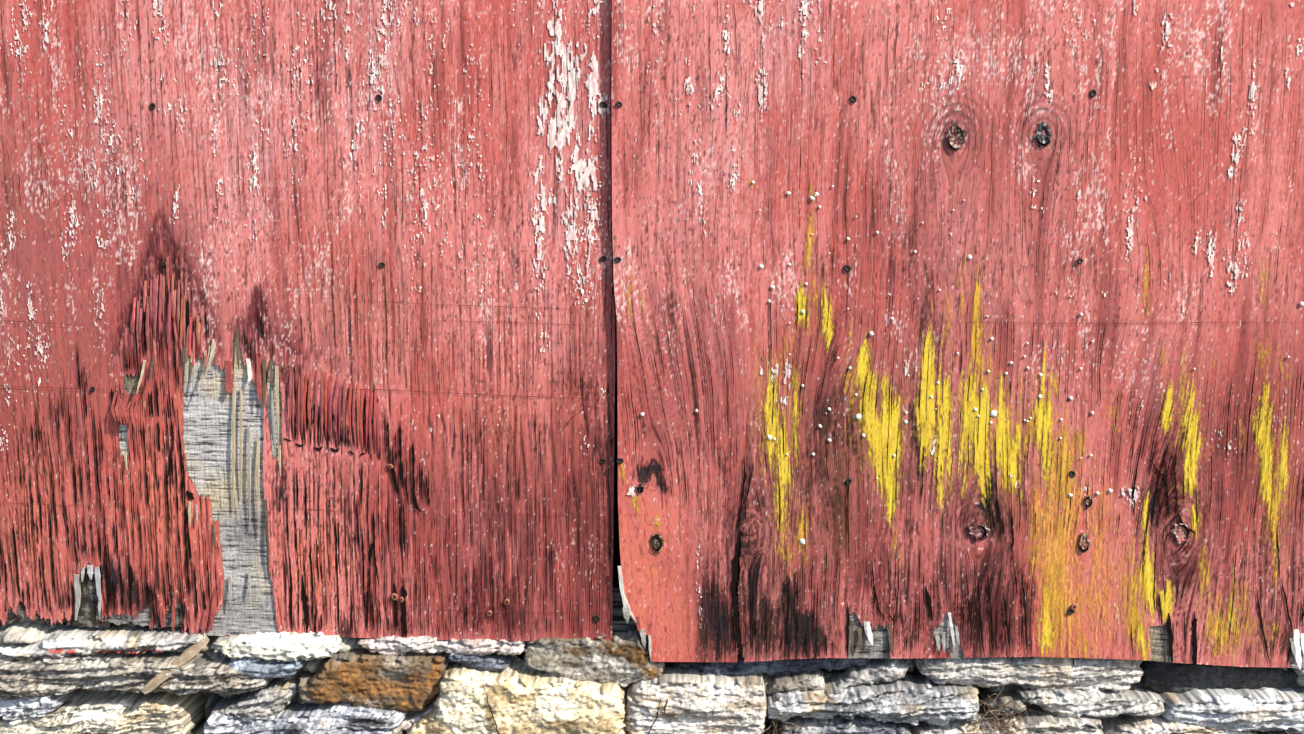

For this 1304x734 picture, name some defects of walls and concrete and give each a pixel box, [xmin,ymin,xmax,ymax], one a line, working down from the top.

crack [0,250,220,654]
crack [0,0,307,224]
leakage [142,237,206,309]
leakage [250,290,267,336]
peeling [513,0,610,352]
crack [199,0,1304,666]
leakage [697,186,1255,662]